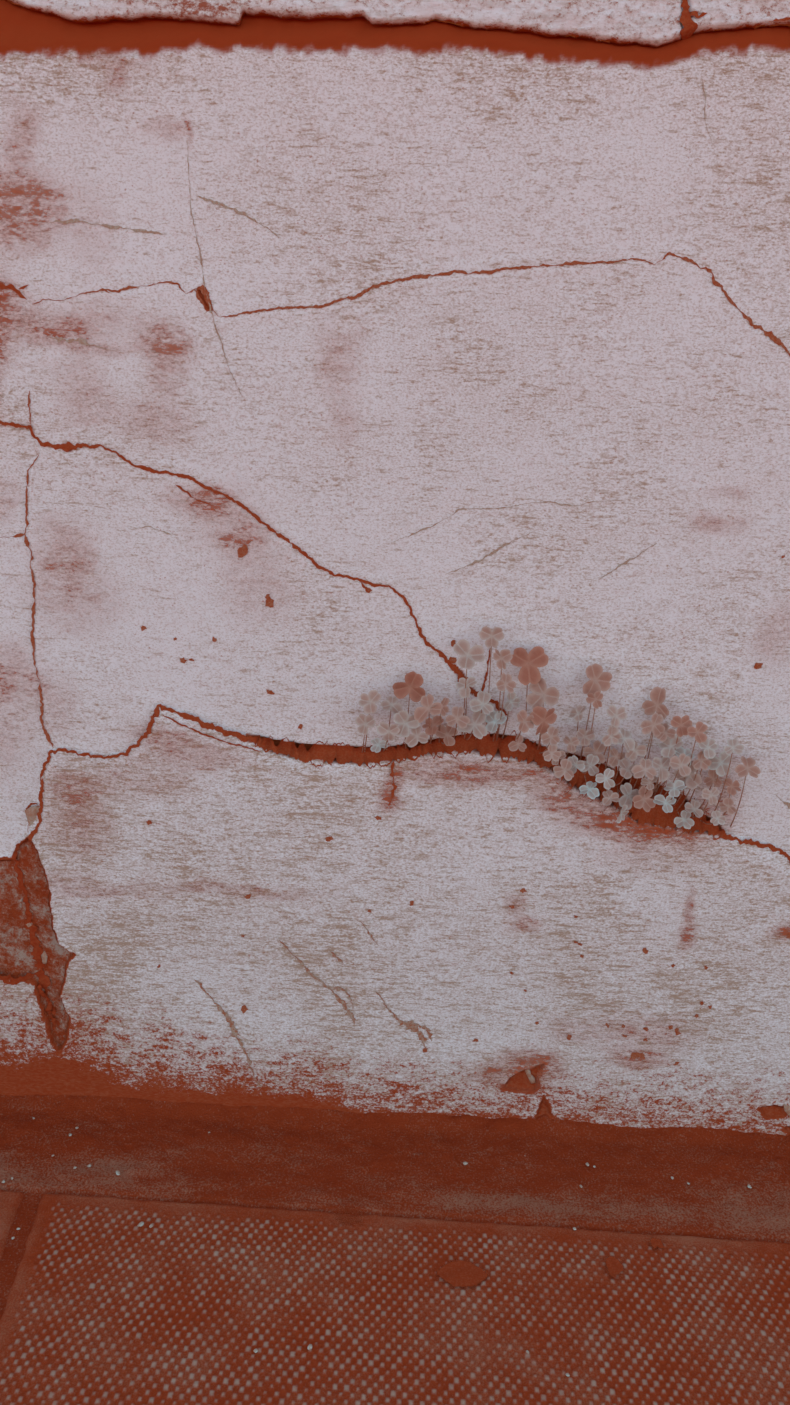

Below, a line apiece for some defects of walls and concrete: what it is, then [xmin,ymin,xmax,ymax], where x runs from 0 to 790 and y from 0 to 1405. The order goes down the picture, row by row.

crack [680,0,707,40]
crack [0,144,790,397]
crack [0,390,790,863]
spalling [0,806,72,1049]